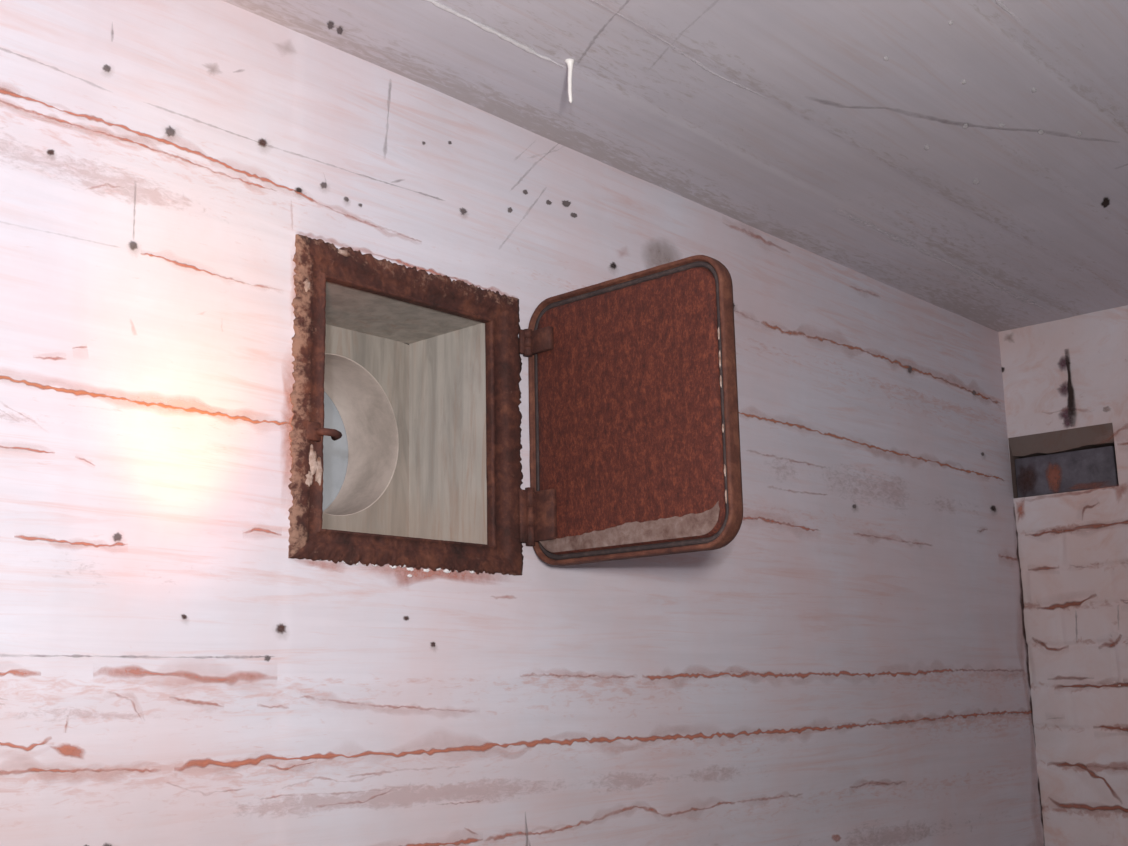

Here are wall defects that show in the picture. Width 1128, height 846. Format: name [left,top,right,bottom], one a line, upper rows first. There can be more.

crack [181,506,1128,770]
rust [121,668,234,681]
crack [10,766,100,774]